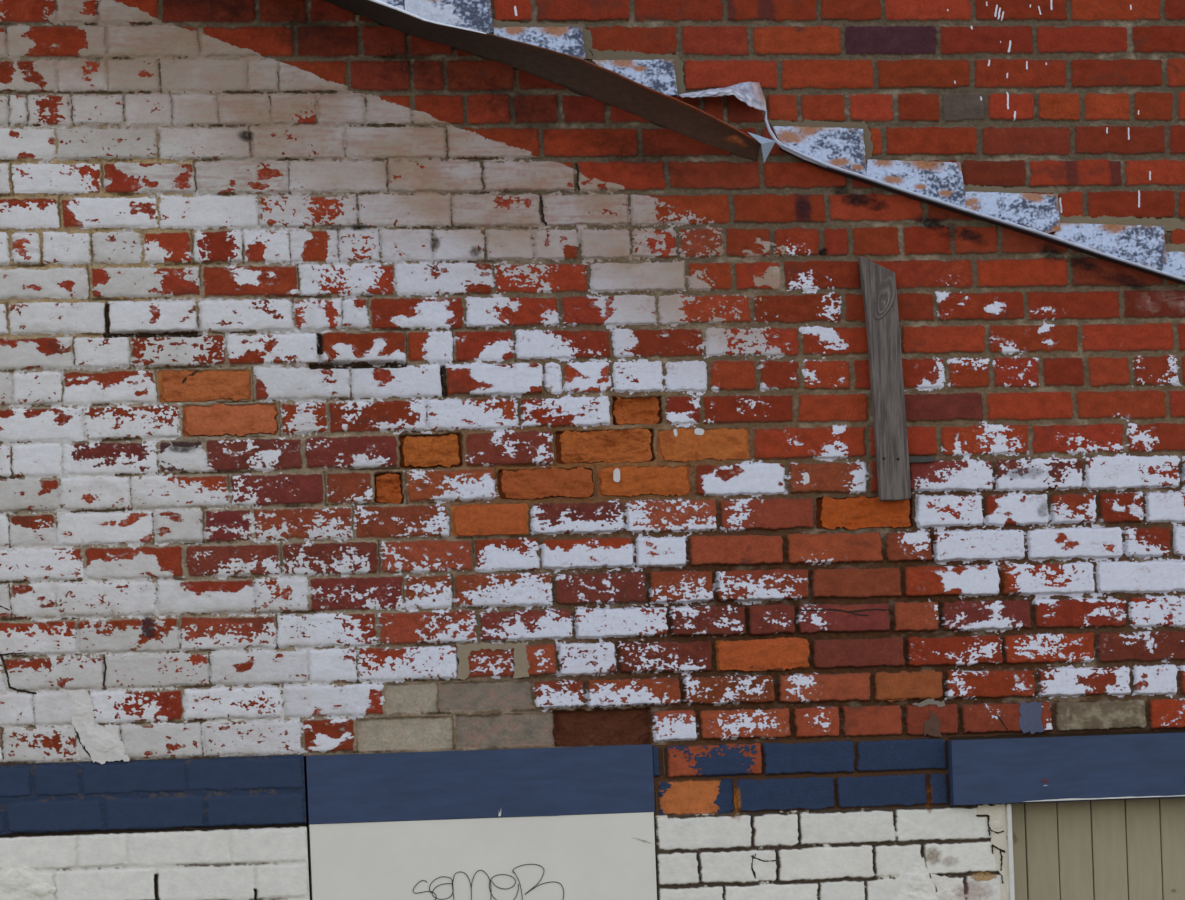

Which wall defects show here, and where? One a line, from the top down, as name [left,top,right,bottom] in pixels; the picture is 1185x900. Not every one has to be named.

peeling [0,0,849,815]
crack [0,652,37,694]
peeling [813,413,1185,730]